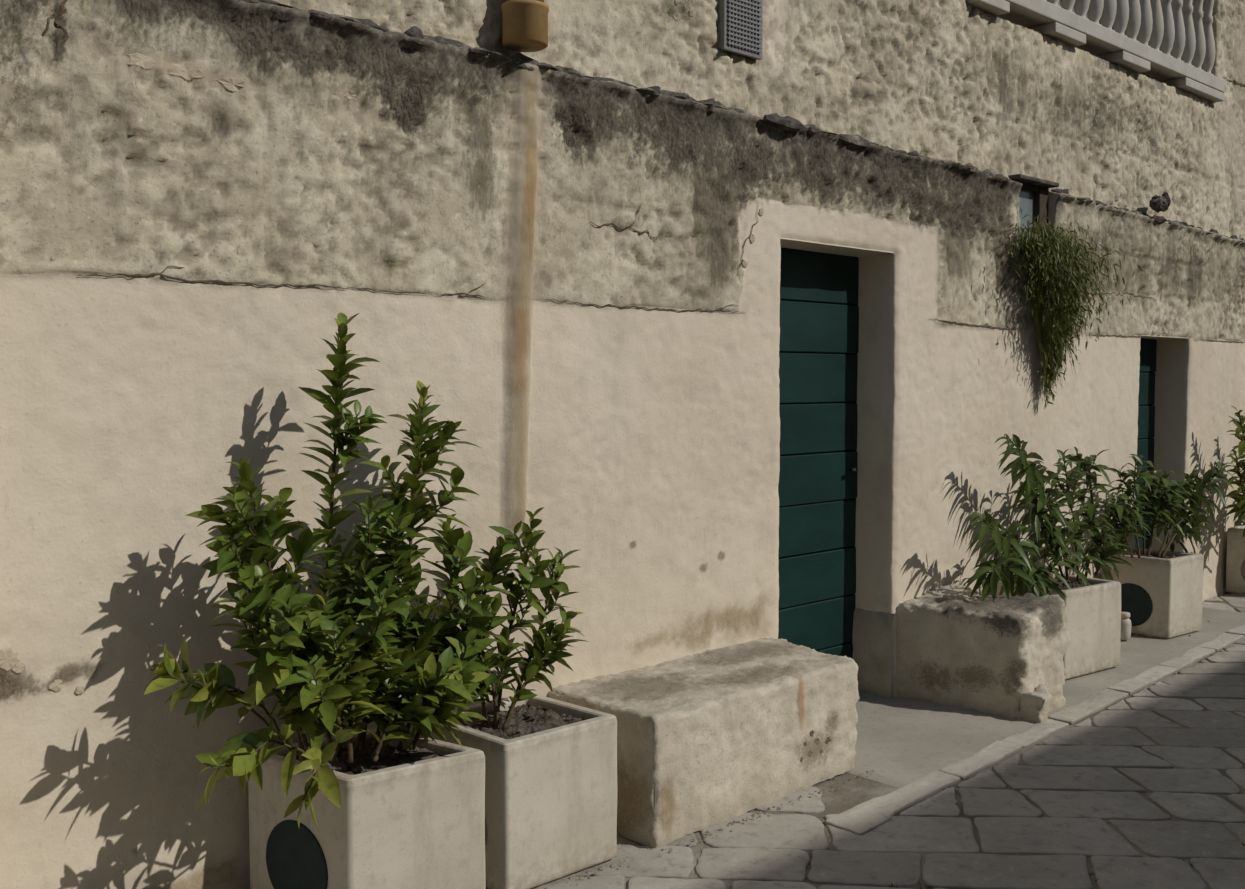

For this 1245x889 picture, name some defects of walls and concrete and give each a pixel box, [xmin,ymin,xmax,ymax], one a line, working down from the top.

water stain [0,0,67,83]
water stain [107,0,497,216]
water stain [987,52,1124,133]
crack [590,201,657,239]
water stain [551,71,1017,294]
spalling [0,647,96,700]